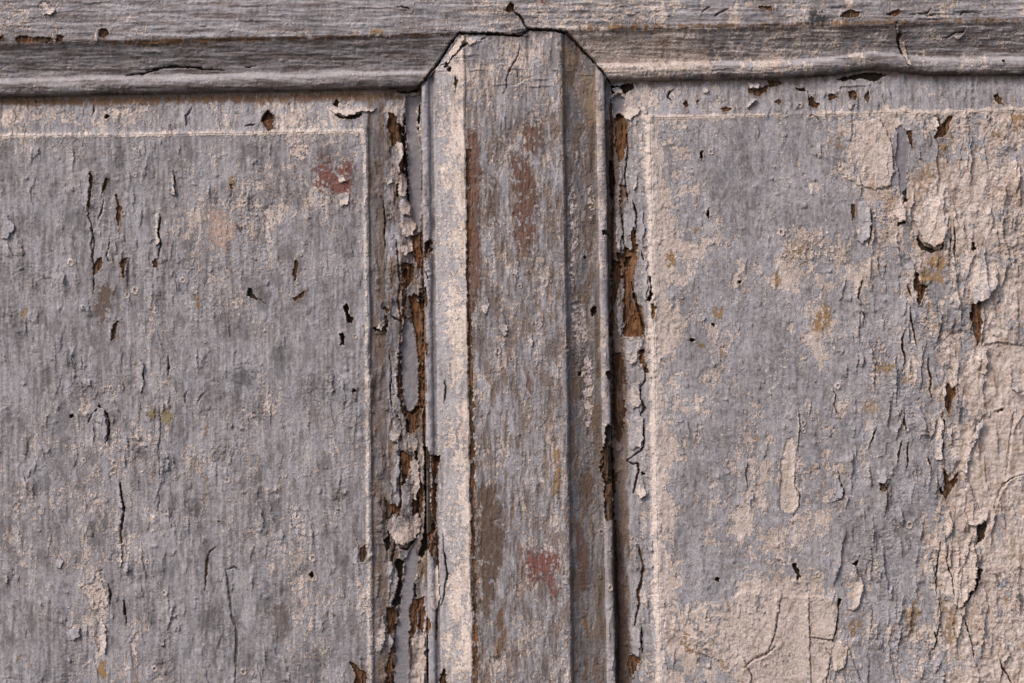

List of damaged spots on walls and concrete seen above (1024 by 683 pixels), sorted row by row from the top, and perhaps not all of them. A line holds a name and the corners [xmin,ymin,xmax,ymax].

crack [398,10,611,94]
peeling [746,80,782,108]
peeling [796,72,949,253]
peeling [933,116,953,139]
peeling [907,273,928,345]
peeling [359,94,447,683]
peeling [567,83,657,683]
crack [621,373,646,493]
peeling [930,265,1024,657]
crack [627,548,645,678]
crack [933,542,955,649]
crack [1000,644,1012,683]